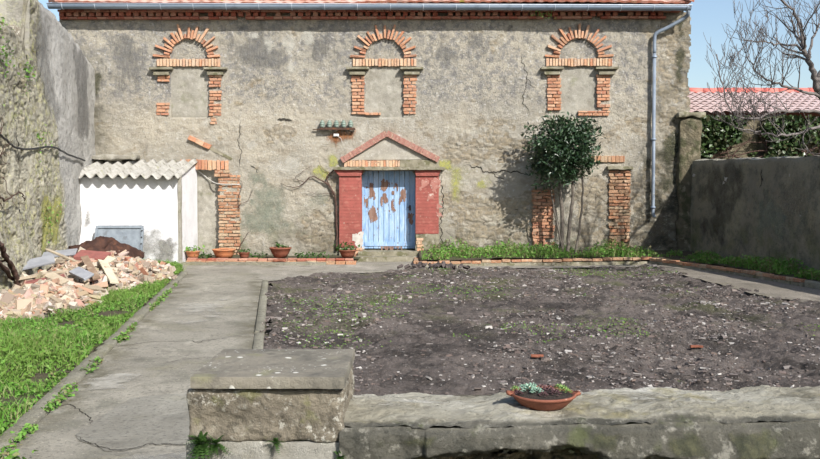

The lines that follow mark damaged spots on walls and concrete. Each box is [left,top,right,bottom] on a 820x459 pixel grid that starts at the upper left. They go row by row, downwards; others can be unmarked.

crack [464,144,526,179]
crack [437,178,445,245]